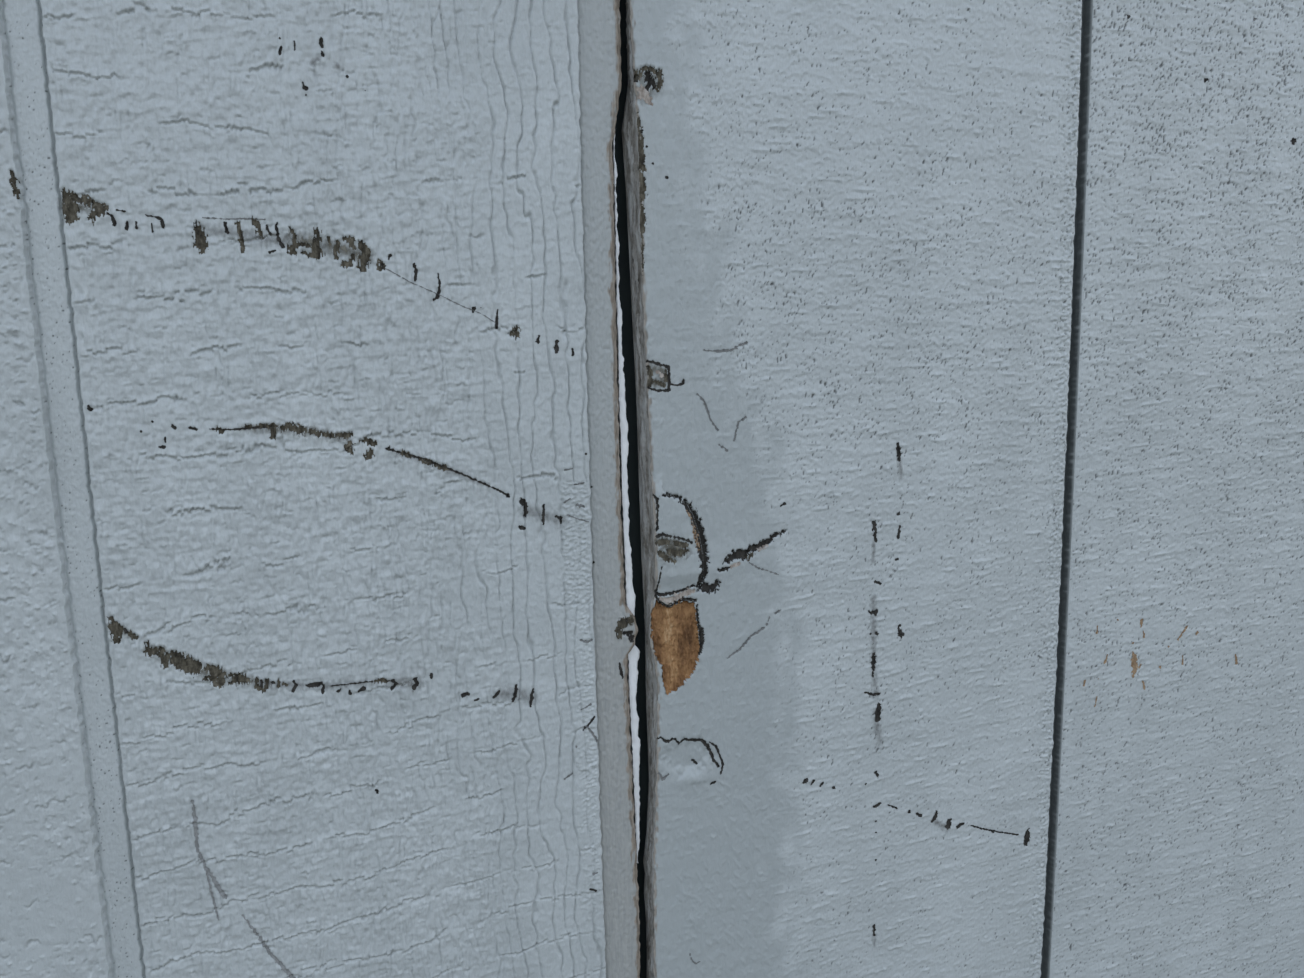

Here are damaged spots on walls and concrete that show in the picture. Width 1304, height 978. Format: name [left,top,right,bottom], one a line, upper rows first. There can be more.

peeling [61,187,165,233]
peeling [192,216,575,356]
crack [140,420,563,530]
peeling [653,492,721,605]
peeling [107,616,433,695]
peeling [461,684,534,707]